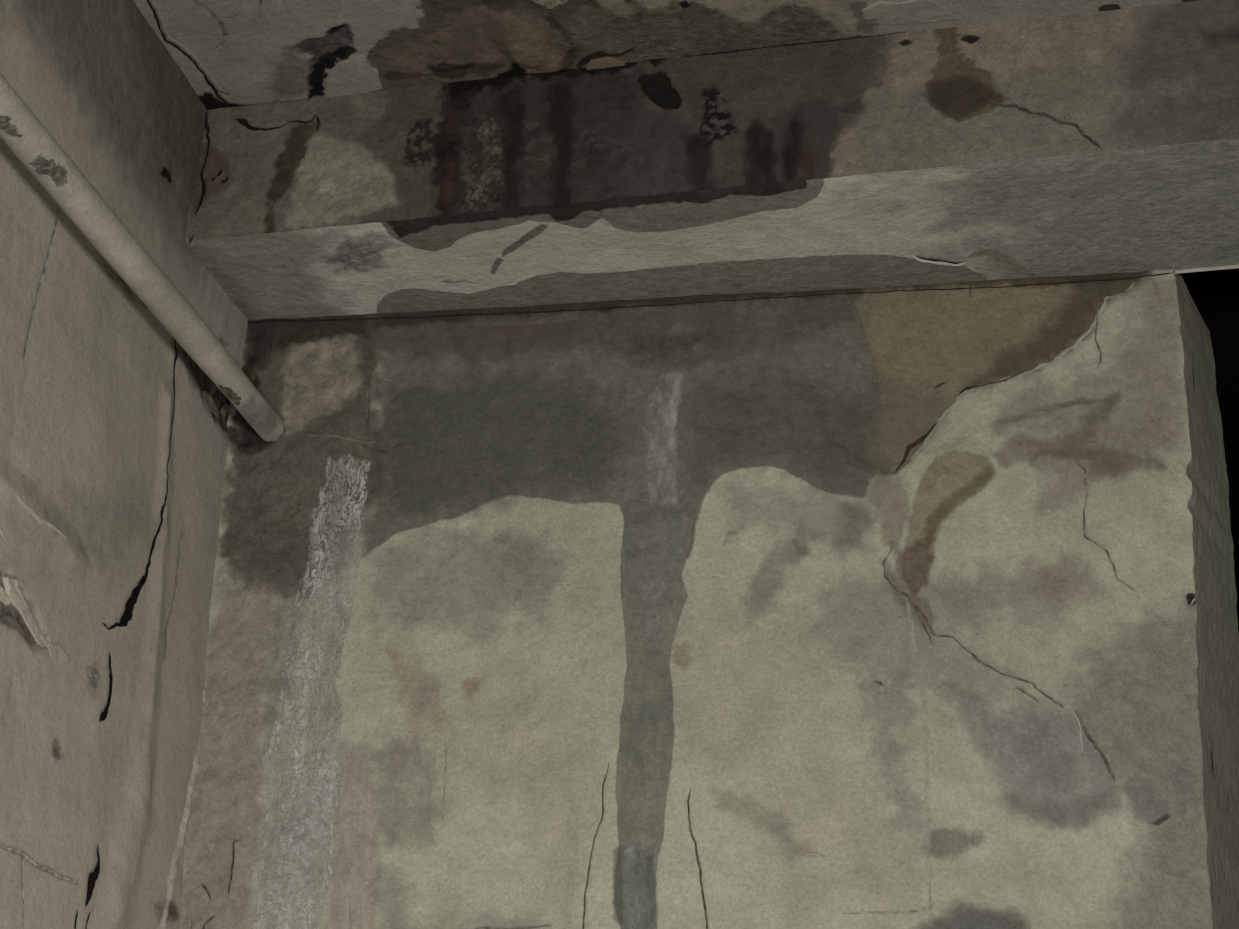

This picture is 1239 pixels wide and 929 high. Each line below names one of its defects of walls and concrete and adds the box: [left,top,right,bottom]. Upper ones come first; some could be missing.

crack [147,0,320,244]
leakage [26,0,1239,251]
crack [976,96,1101,149]
flaking render [0,577,50,653]
crack [99,340,184,722]
leakage [180,233,1149,929]
crack [894,424,936,474]
crack [934,374,1018,395]
crack [882,544,1115,781]
crack [0,845,100,929]
crack [583,763,611,929]
crack [686,790,708,929]